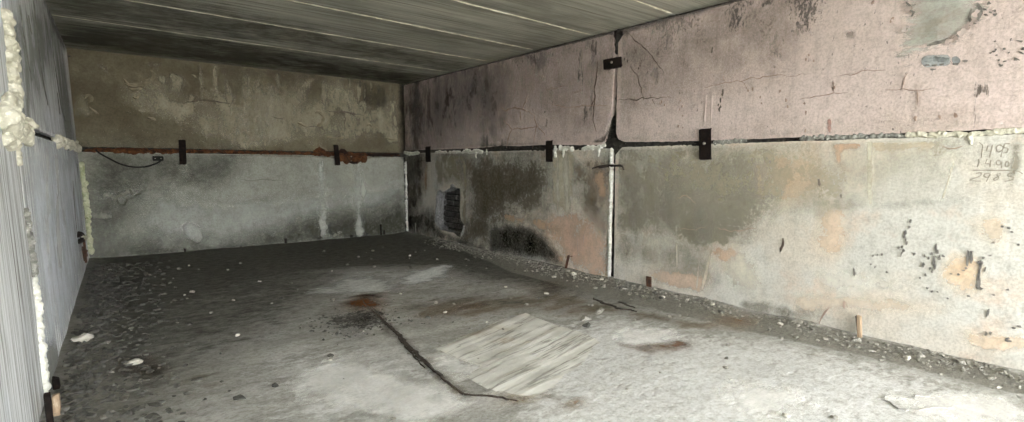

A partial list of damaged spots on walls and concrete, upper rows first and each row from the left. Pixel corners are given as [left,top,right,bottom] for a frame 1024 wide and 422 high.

peeling [890,0,997,70]
crack [502,32,666,148]
crack [707,70,928,102]
corrosion [82,147,399,164]
damp [35,64,844,334]
spalling [434,184,465,236]